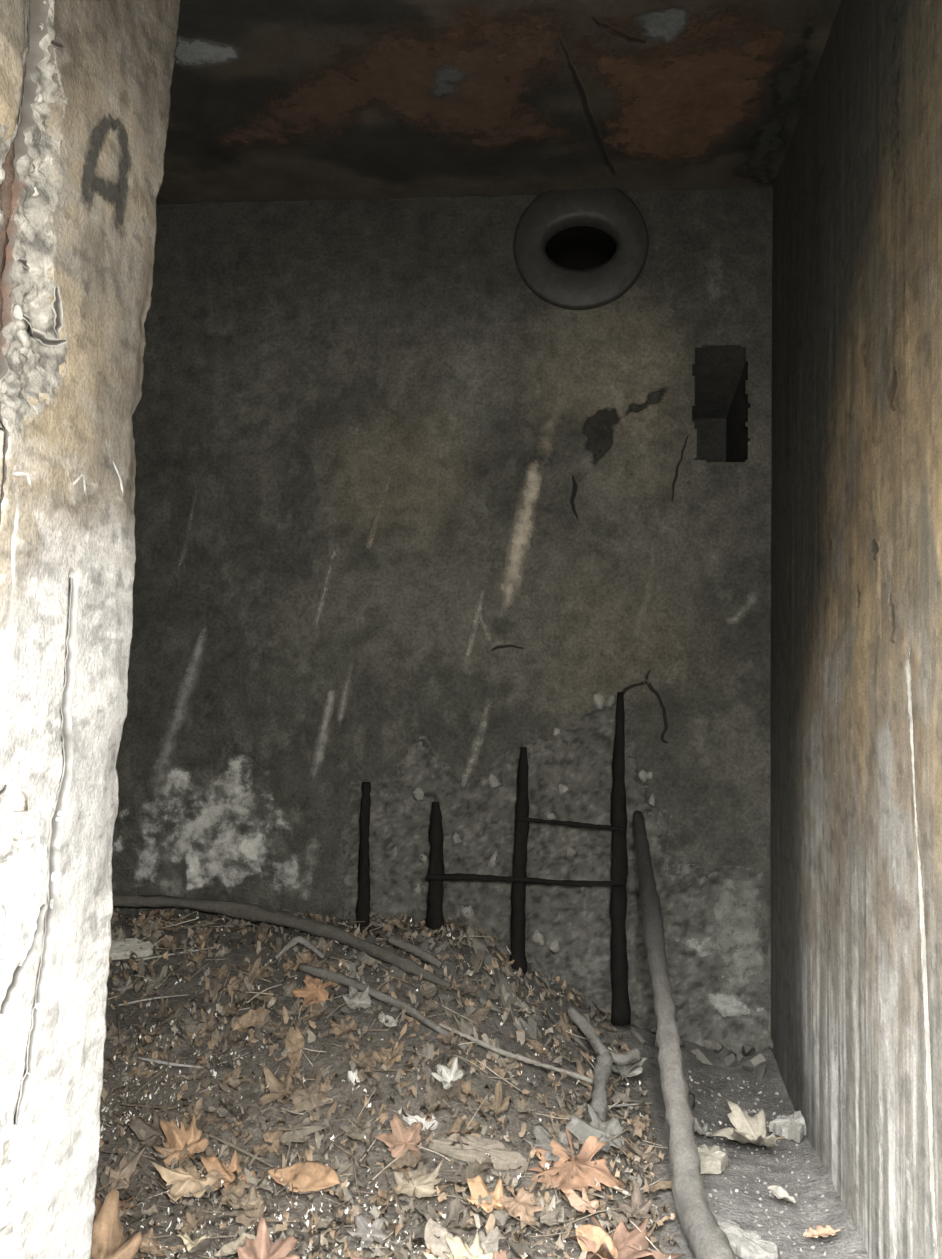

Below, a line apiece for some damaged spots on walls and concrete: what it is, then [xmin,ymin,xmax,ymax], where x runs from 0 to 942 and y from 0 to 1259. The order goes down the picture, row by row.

spalling [0,0,68,436]
peeling [568,475,580,520]
peeling [583,388,666,465]
peeling [671,436,689,502]
water stain [135,629,316,899]
water stain [314,666,353,774]
spalling [0,776,36,989]
crack [0,577,78,1127]
spalling [0,1127,18,1259]